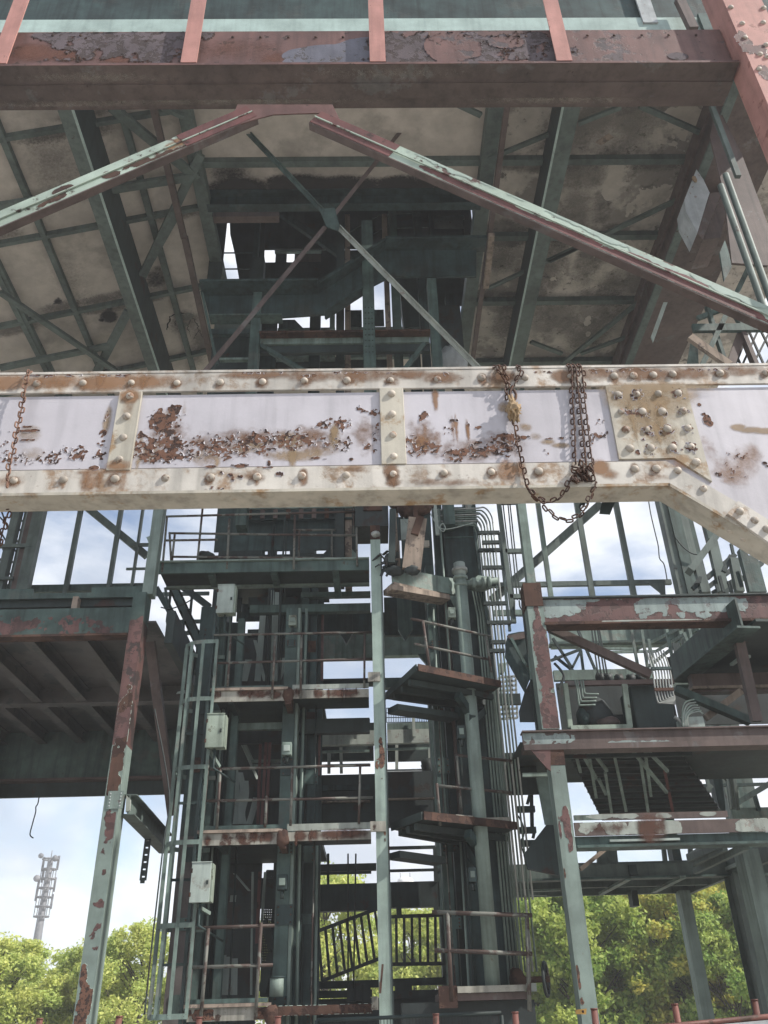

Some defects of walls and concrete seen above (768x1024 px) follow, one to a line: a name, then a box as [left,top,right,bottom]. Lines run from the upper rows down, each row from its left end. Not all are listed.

corrosion [0,404,380,490]
corrosion [216,371,542,486]
corrosion [593,460,614,477]
corrosion [534,367,768,474]
peeling [543,599,619,618]
corrosion [532,606,560,729]
corrosion [101,684,133,855]
corrosion [204,832,273,845]
corrosion [558,806,573,853]
peeling [578,822,599,835]
peeling [656,813,682,834]
peeling [735,818,768,832]